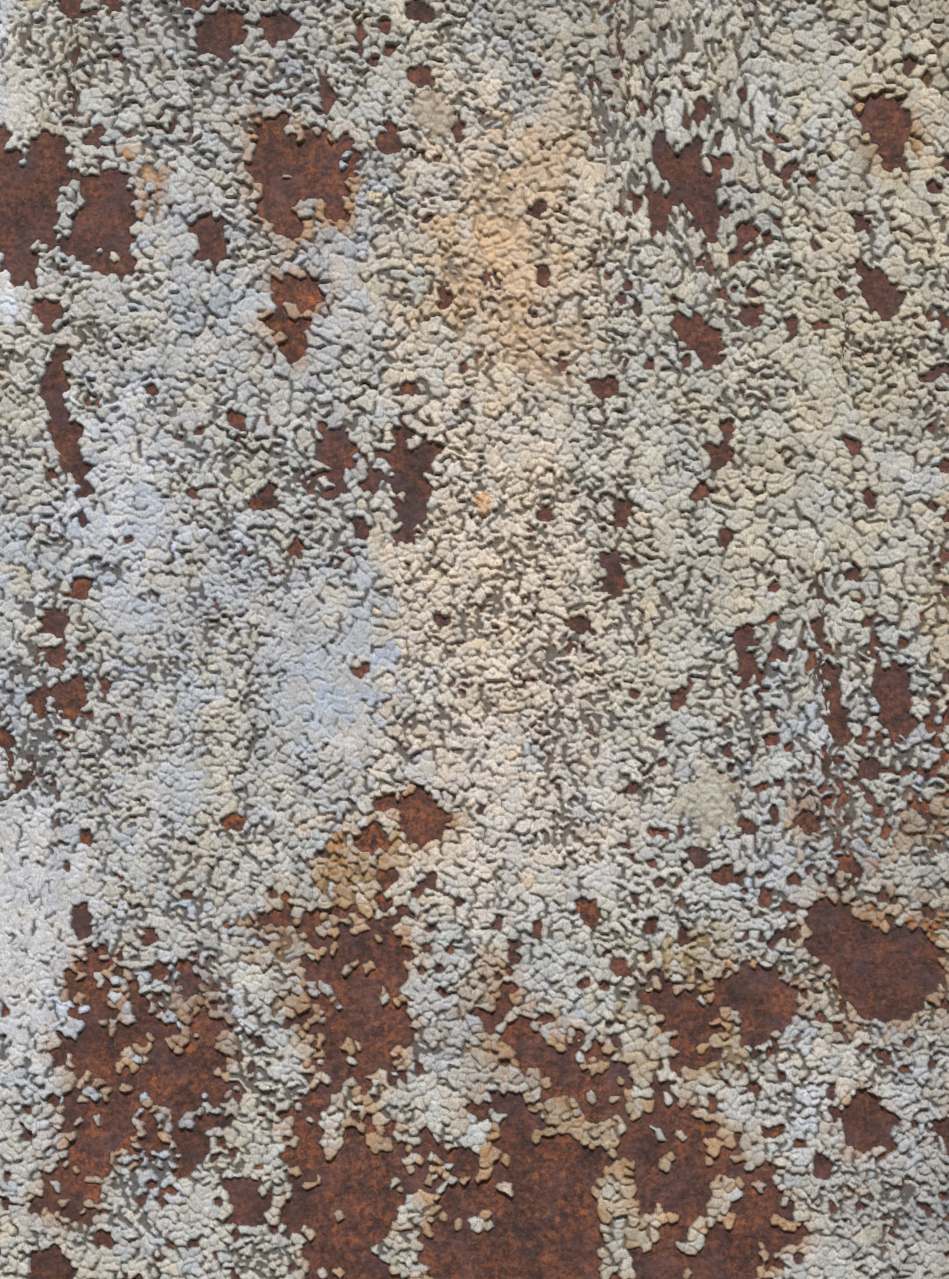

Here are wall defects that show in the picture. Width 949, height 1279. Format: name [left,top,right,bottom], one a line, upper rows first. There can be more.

crack [66,0,120,122]
crack [616,0,669,120]
peeling [829,5,949,233]
peeling [558,342,627,417]
peeling [577,0,929,560]
crack [839,278,862,409]
peeling [519,484,675,644]
crack [0,745,33,802]
peeling [709,575,799,768]
crack [804,574,833,771]
peeling [804,650,949,851]
peeling [0,765,949,1279]